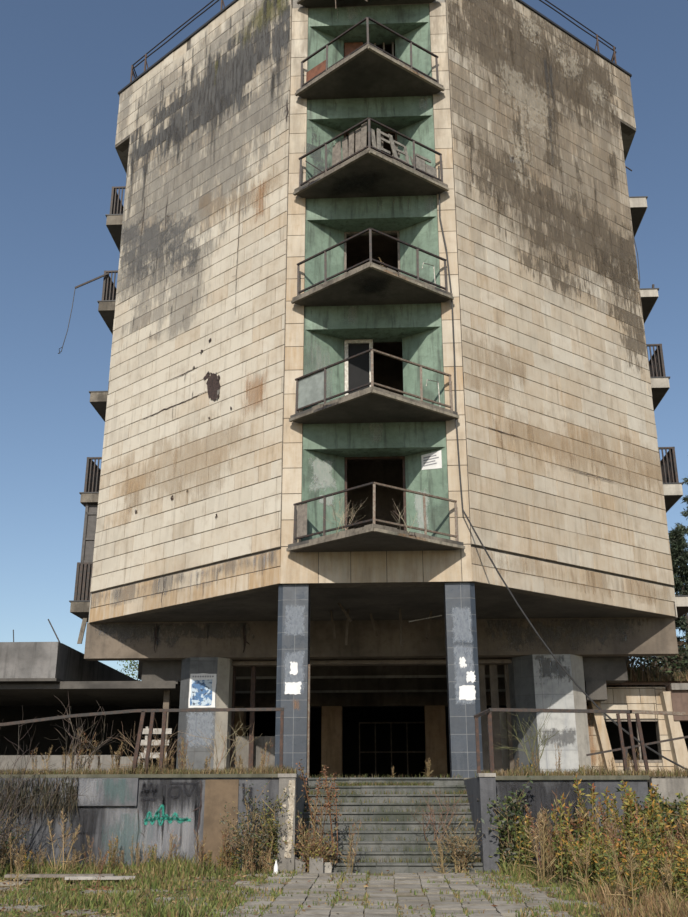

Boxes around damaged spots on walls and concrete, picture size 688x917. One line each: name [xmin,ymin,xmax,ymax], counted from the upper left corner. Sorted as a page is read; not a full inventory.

water stain [127,0,290,198]
water stain [447,0,647,372]
water stain [120,213,199,282]
crack [144,367,206,419]
hole [203,371,220,401]